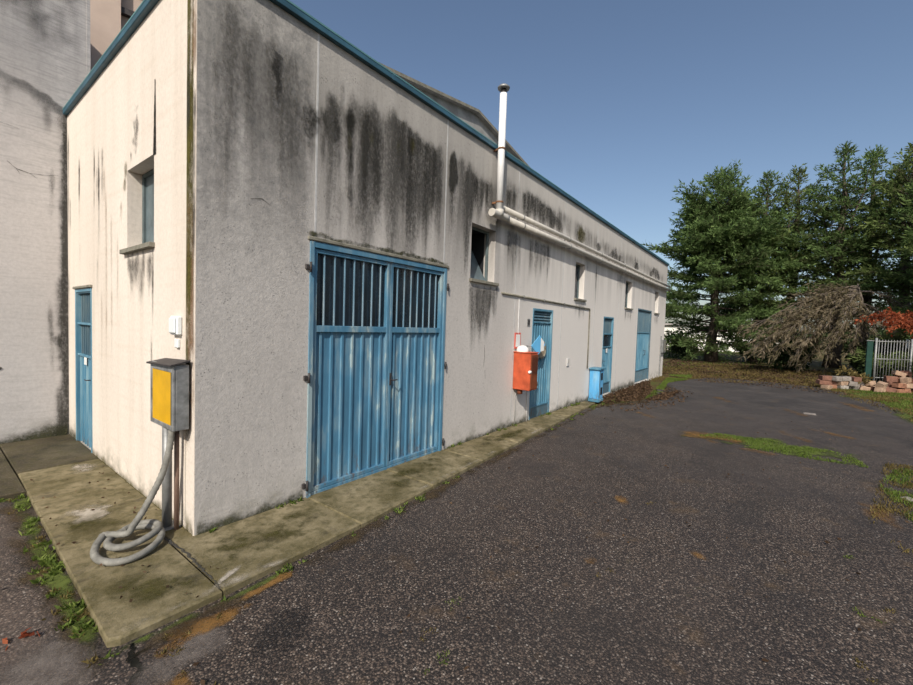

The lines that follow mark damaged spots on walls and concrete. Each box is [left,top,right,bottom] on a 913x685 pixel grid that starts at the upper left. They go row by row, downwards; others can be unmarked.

water stain [272,54,281,98]
water stain [306,99,380,194]
water stain [395,120,437,227]
water stain [449,152,488,211]
water stain [506,191,561,230]
water stain [14,79,69,434]
water stain [471,287,497,328]
crack [125,643,177,685]